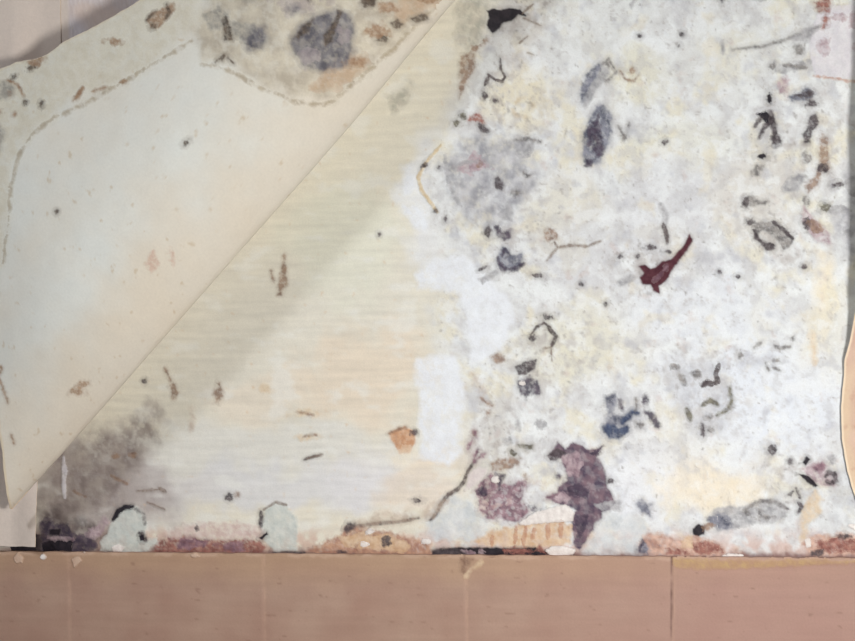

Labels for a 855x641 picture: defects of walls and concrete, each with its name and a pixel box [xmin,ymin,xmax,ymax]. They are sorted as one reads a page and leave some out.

peeling [808,0,855,84]
spalling [448,109,493,136]
peeling [416,143,450,228]
spalling [635,231,696,297]
water stain [10,375,173,552]
spalling [540,437,744,557]
water stain [255,528,272,543]
spalling [99,494,497,580]
water stain [448,542,549,555]
water stain [633,537,649,556]
spalling [798,523,855,557]